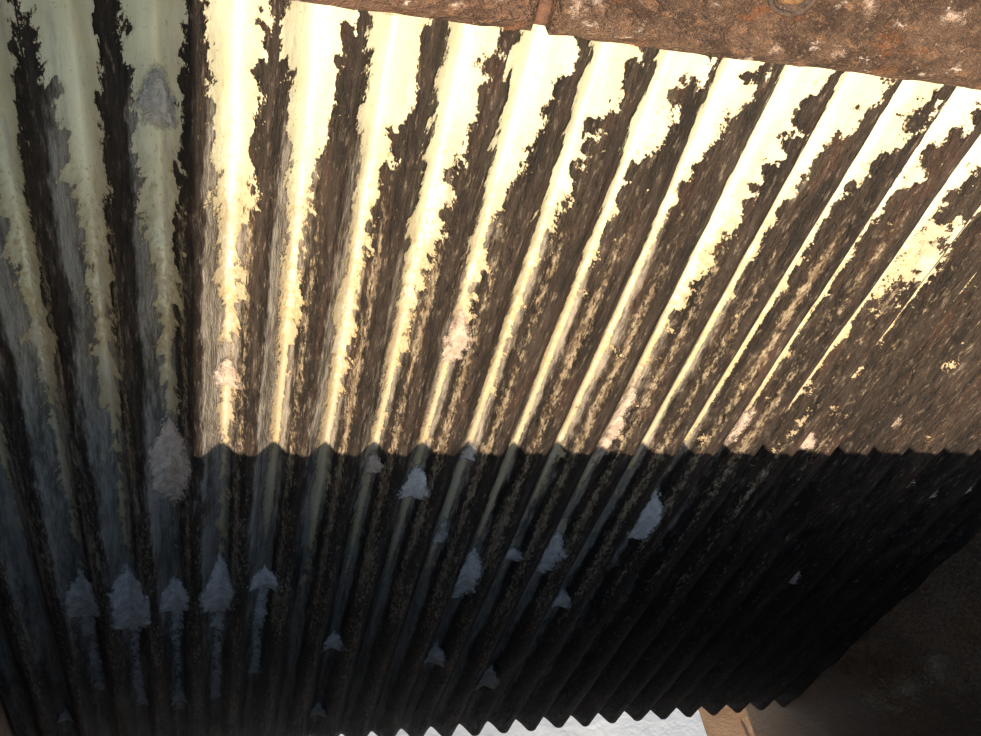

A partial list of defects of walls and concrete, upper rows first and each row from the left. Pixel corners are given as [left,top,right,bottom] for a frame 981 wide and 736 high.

peeling [113,0,189,421]
peeling [0,0,132,575]
peeling [200,0,432,606]
peeling [344,21,981,590]
water stain [79,615,106,691]
water stain [128,626,149,706]
water stain [169,608,187,706]
water stain [209,611,225,699]
water stain [249,586,269,668]